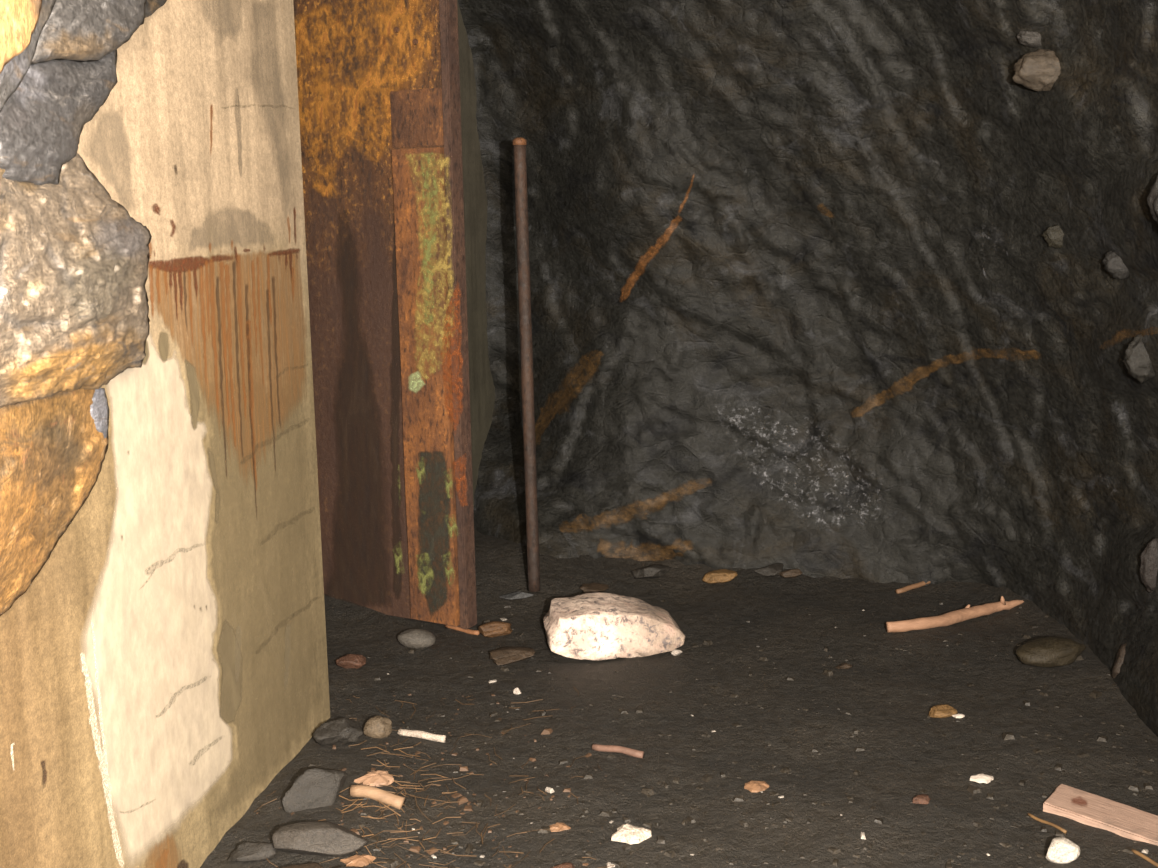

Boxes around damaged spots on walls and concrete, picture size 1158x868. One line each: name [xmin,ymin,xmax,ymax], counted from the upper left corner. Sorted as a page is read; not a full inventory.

rust [296,0,433,196]